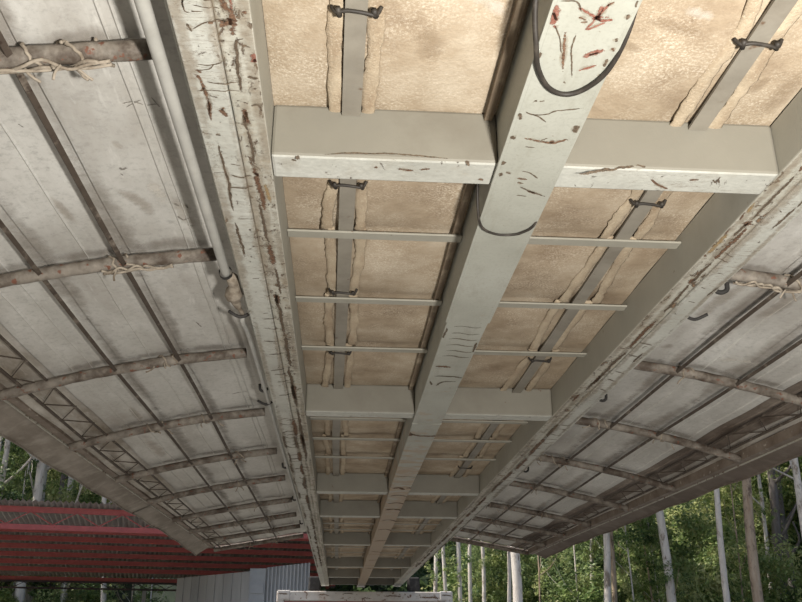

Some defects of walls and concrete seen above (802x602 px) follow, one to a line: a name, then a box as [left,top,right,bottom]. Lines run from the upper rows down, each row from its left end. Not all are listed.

corrosion [550,5,560,29]
corrosion [579,2,615,30]
peeling [234,39,242,91]
crack [555,26,576,83]
crack [510,100,580,148]
peeling [218,146,252,209]
crack [499,161,545,197]
crack [442,329,478,358]